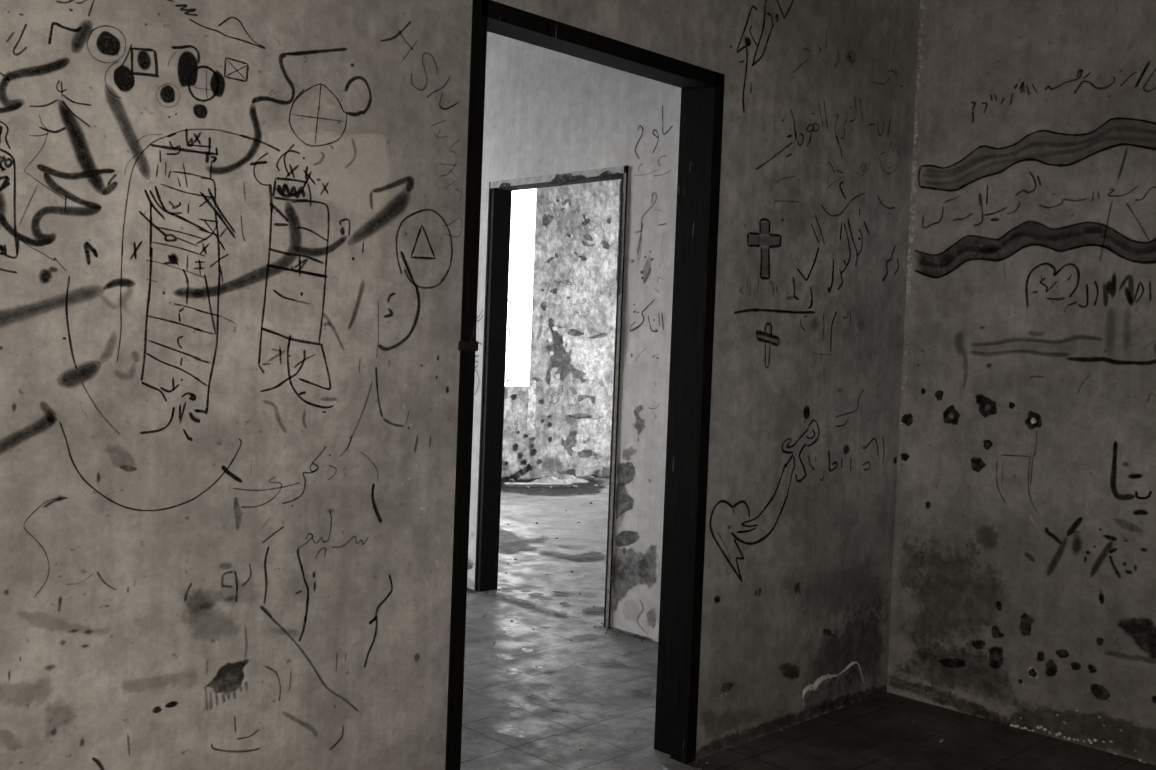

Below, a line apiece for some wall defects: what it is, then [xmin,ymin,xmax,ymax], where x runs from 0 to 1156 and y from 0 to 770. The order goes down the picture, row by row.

leakage [562,383,601,460]
leakage [501,460,606,496]
peeling [615,462,636,518]
peeling [616,530,639,547]